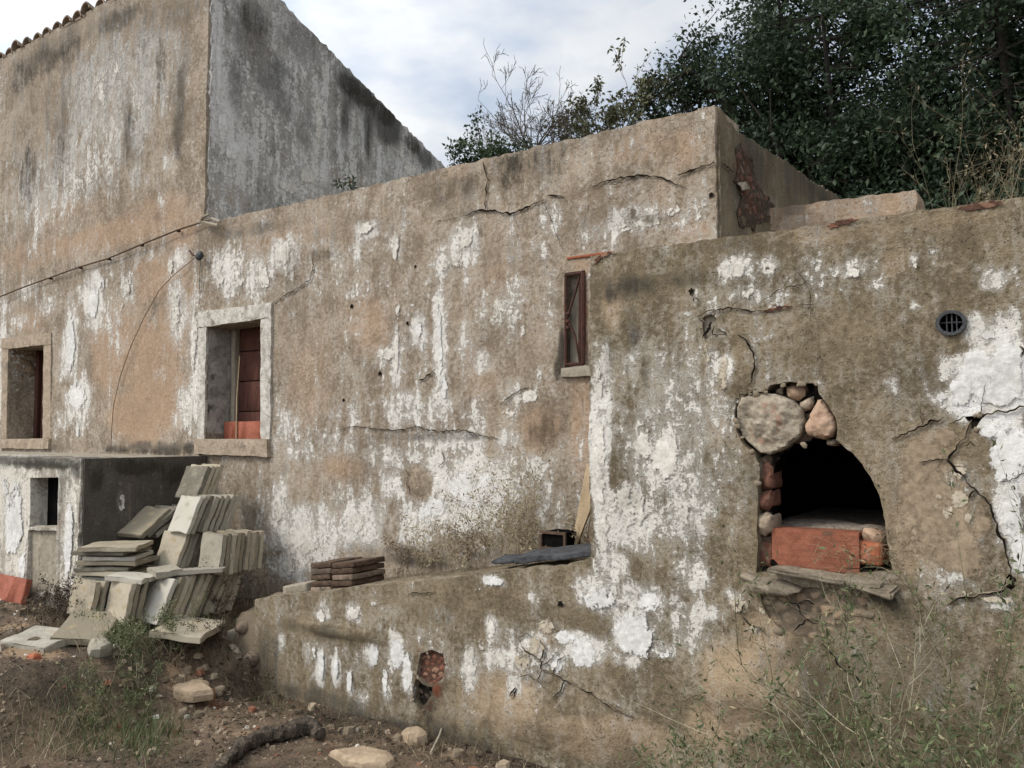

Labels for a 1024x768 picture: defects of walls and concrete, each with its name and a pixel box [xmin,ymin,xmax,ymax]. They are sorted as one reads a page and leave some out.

water stain [343,77,394,125]
crack [435,162,565,248]
crack [593,161,733,187]
crack [693,264,816,386]
peeling [1,474,27,578]
peeling [632,421,684,481]
flaking render [733,381,841,571]
crack [892,384,1024,606]
flaking render [897,332,1024,603]
peeling [580,585,672,659]
peeling [368,636,448,712]
crack [510,633,635,719]